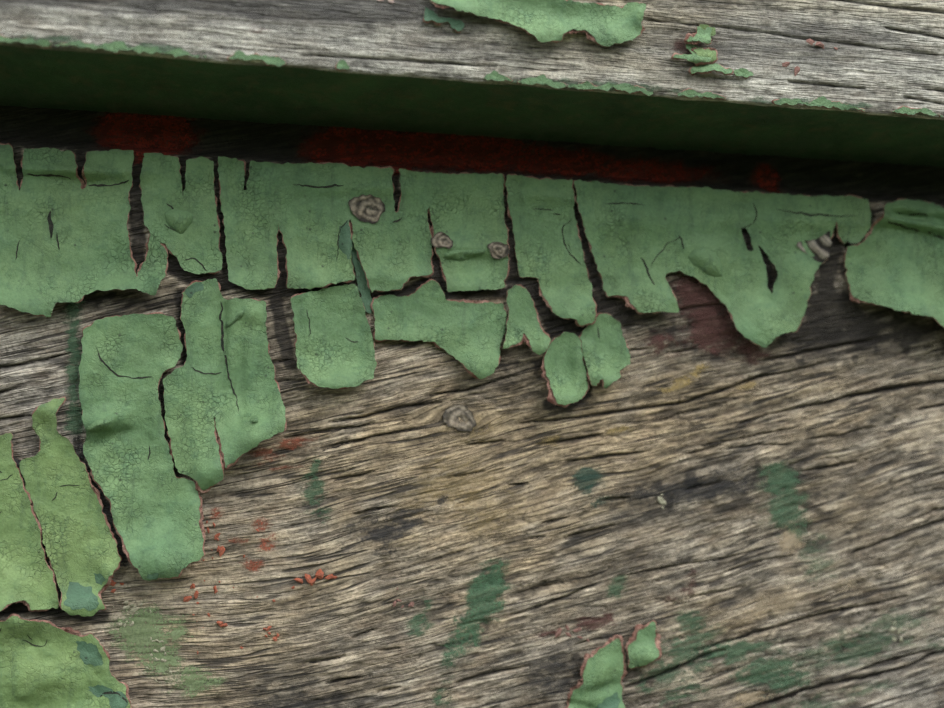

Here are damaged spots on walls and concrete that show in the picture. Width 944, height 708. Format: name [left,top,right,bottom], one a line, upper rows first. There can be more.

peeling [423,0,646,47]
peeling [671,24,754,79]
peeling [677,88,726,101]
crack [191,303,239,412]
peeling [0,143,944,708]